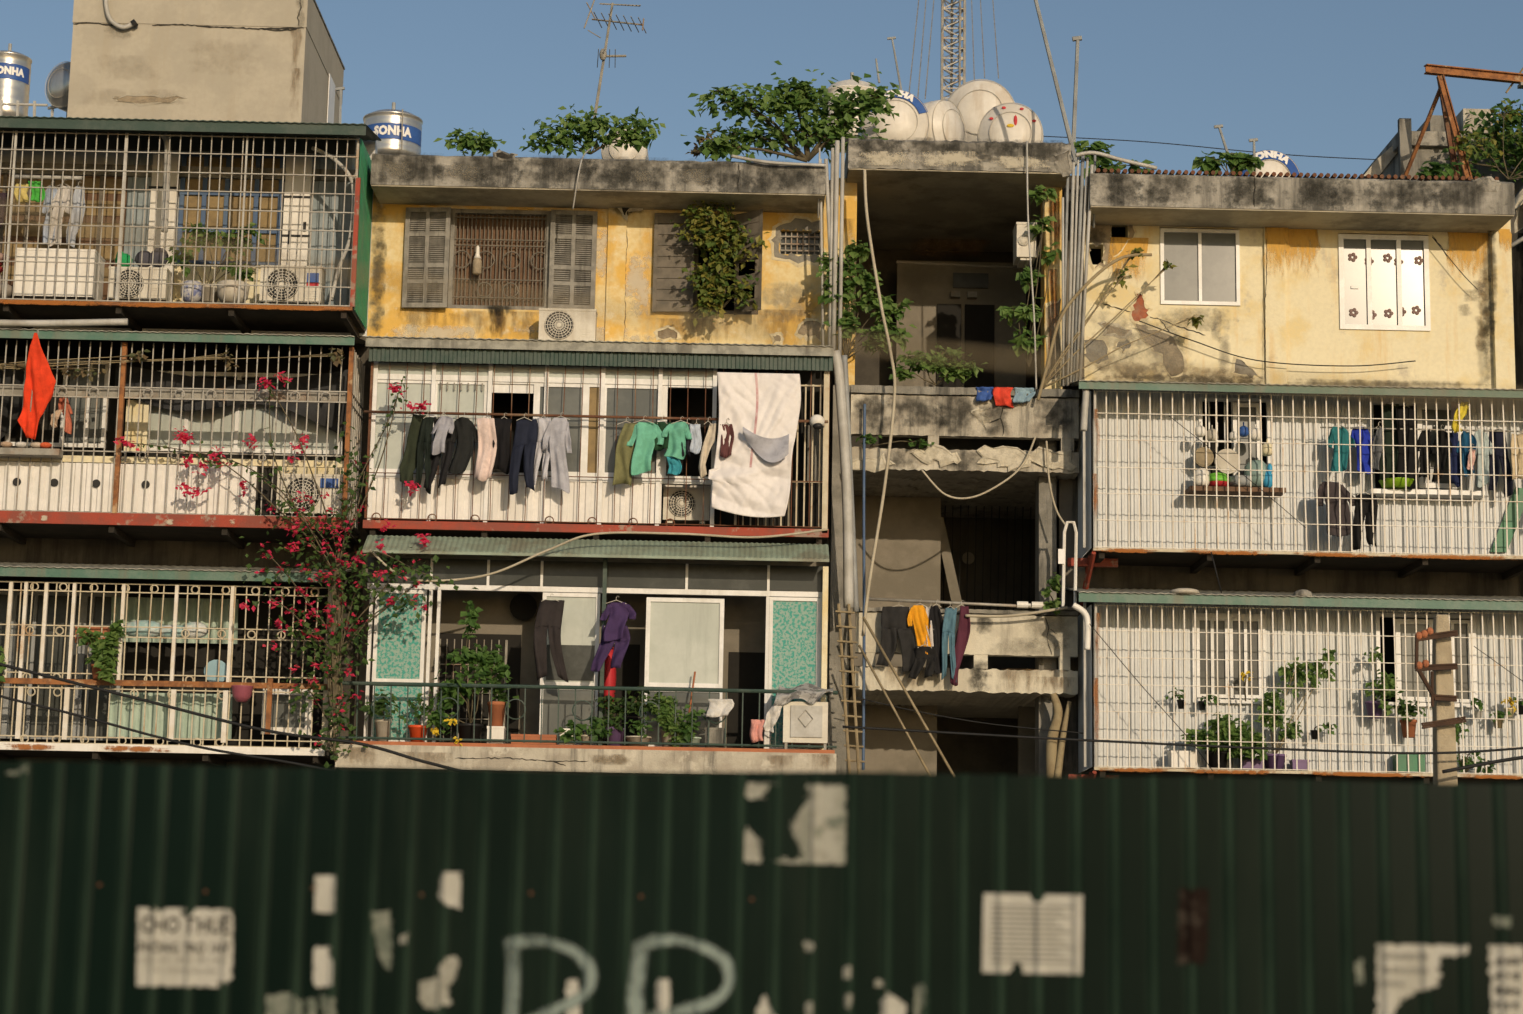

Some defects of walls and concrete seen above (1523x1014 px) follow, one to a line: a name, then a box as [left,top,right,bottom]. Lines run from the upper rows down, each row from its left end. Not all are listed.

leakage [387,155,506,180]
leakage [535,157,579,180]
leakage [603,160,661,187]
leakage [682,163,735,184]
leakage [759,164,811,189]
leakage [1109,174,1185,201]
leakage [1235,181,1264,204]
leakage [1381,183,1482,206]
leakage [488,305,509,325]
leakage [1478,231,1496,378]
leakage [1121,367,1249,384]
leakage [856,397,1006,433]